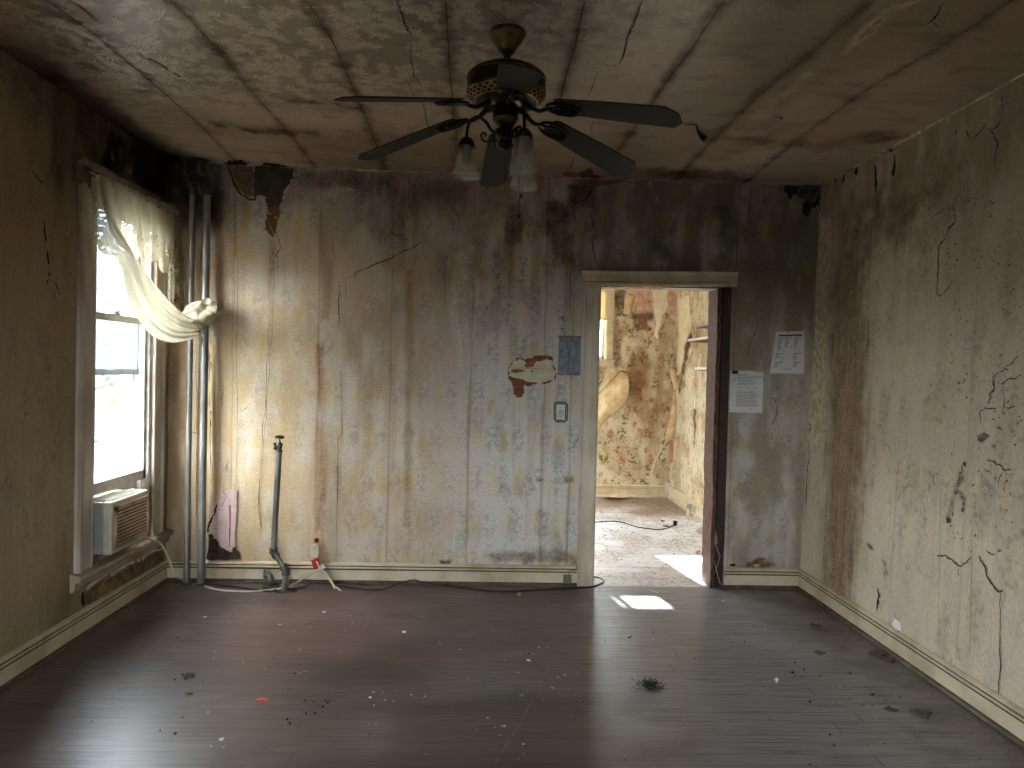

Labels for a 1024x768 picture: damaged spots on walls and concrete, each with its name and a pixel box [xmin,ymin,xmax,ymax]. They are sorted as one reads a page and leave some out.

crack [397,2,429,127]
crack [588,1,643,95]
crack [955,94,1004,166]
flaking render [224,160,294,207]
crack [931,198,956,297]
flaking render [615,290,676,343]
peeling [507,355,556,398]
water stain [824,253,869,590]
crack [979,355,1023,430]
crack [985,459,1011,491]
flaking render [206,489,241,560]
crack [933,473,1003,694]